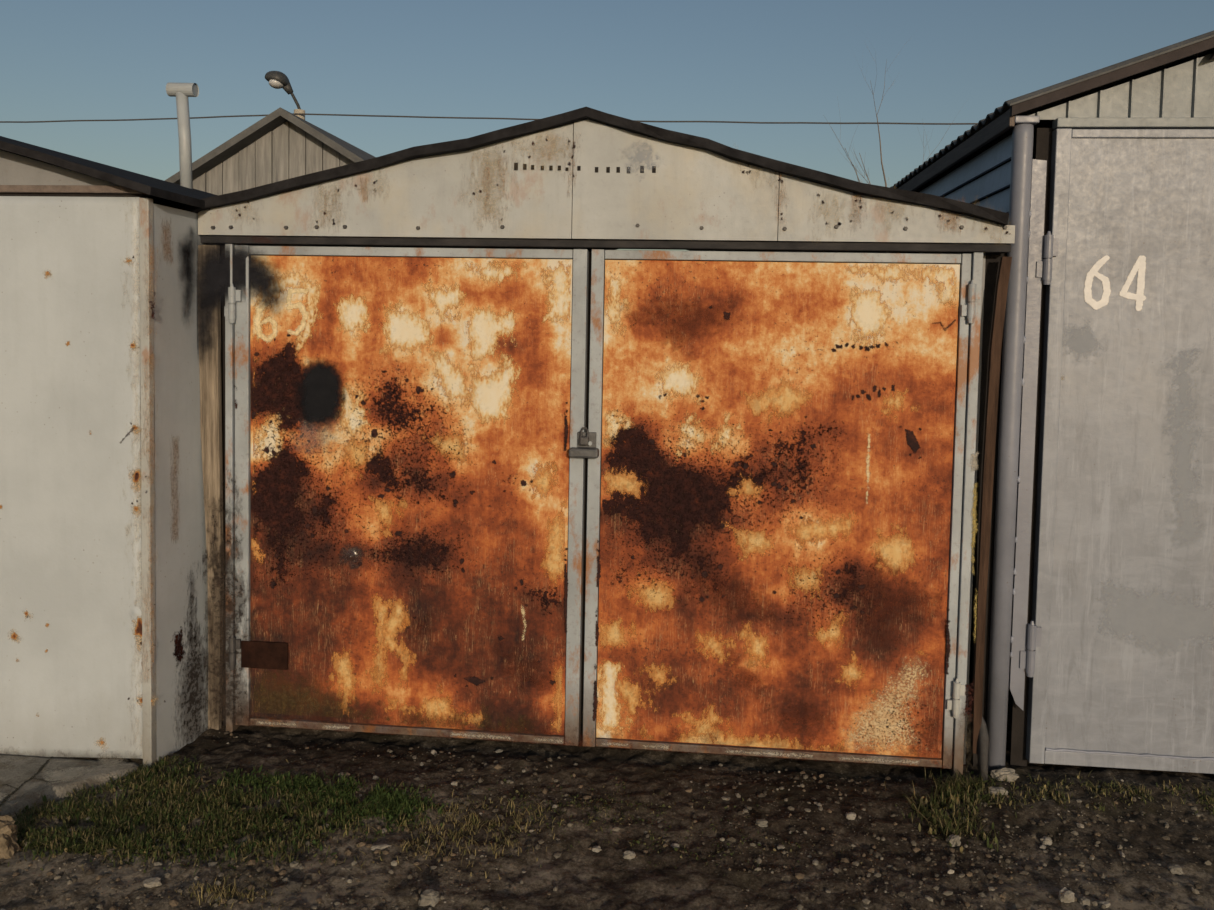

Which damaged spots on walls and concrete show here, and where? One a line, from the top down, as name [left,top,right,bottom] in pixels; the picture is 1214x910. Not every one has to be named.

corrosion [251,334,348,589]
corrosion [355,370,475,507]
corrosion [899,426,922,459]
corrosion [601,416,837,614]
corrosion [358,531,465,578]
corrosion [514,579,564,615]
corrosion [833,564,865,615]
crack [0,756,61,806]
corrosion [443,730,519,741]
corrosion [706,738,813,759]
corrosion [834,754,919,765]